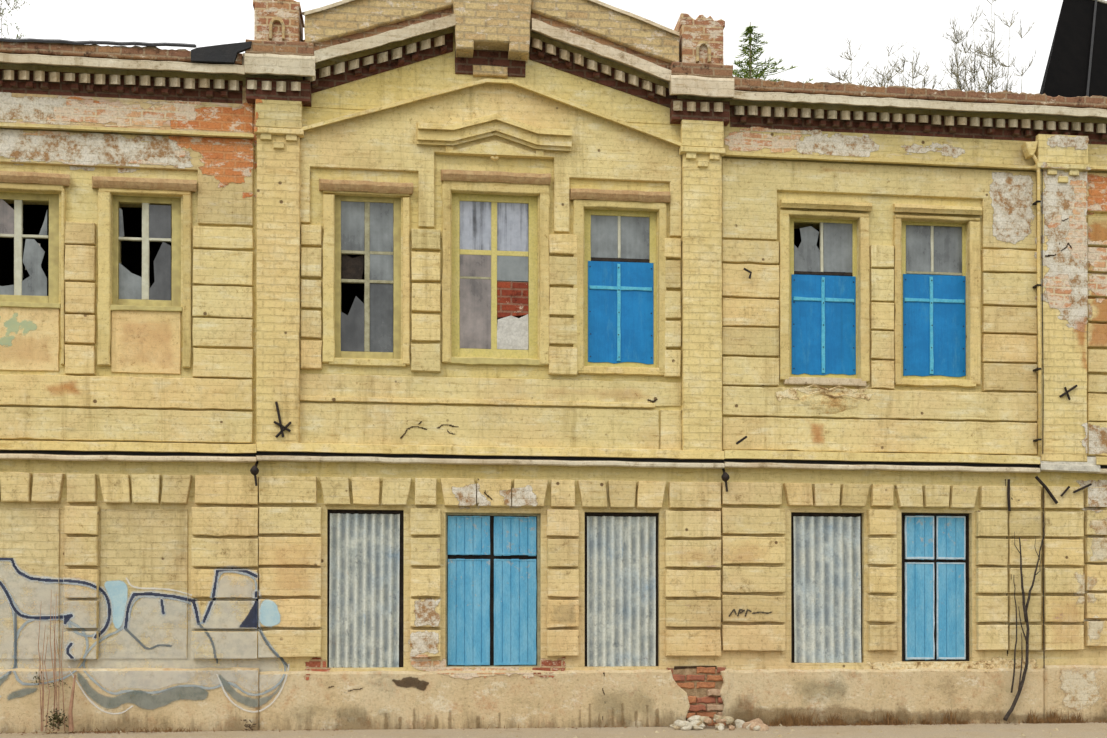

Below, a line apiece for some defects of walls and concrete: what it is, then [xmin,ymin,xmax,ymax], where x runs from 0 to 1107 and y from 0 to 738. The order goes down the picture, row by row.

peeling [0,92,263,198]
peeling [724,126,879,157]
peeling [1047,135,1089,150]
peeling [989,162,1107,332]
peeling [1080,423,1107,454]
peeling [451,484,538,509]
peeling [392,598,566,691]
spalling [661,666,729,727]